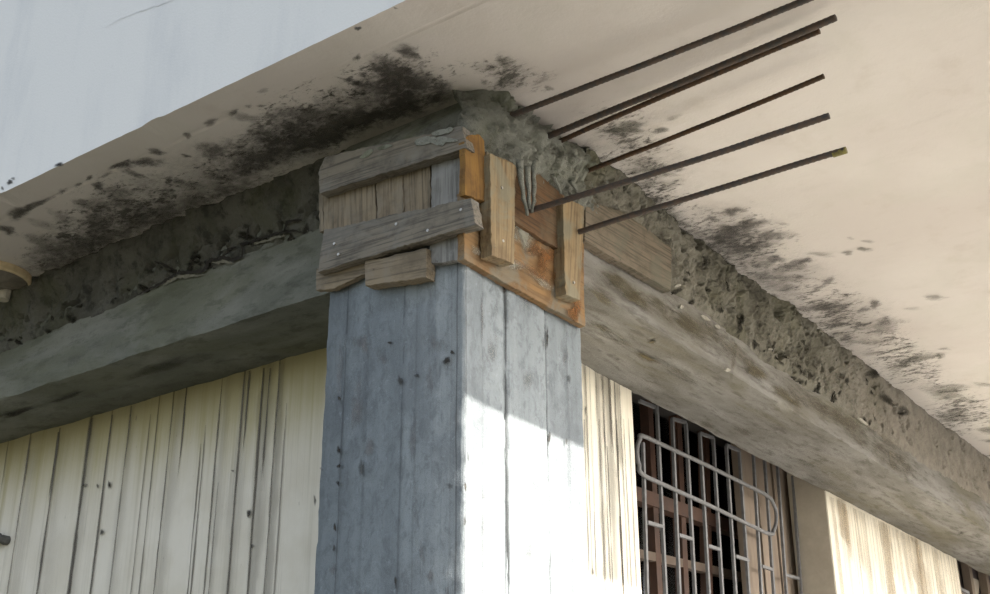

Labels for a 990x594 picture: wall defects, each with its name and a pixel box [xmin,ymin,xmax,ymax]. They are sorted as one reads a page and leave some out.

mould [111,150,162,176]
mould [185,47,448,184]
mould [597,116,680,211]
mould [1,200,45,234]
mould [34,176,178,268]
spalling [0,150,345,354]
spalling [528,74,990,504]
damp [681,210,871,348]
mould [877,337,942,383]
damp [929,389,987,432]